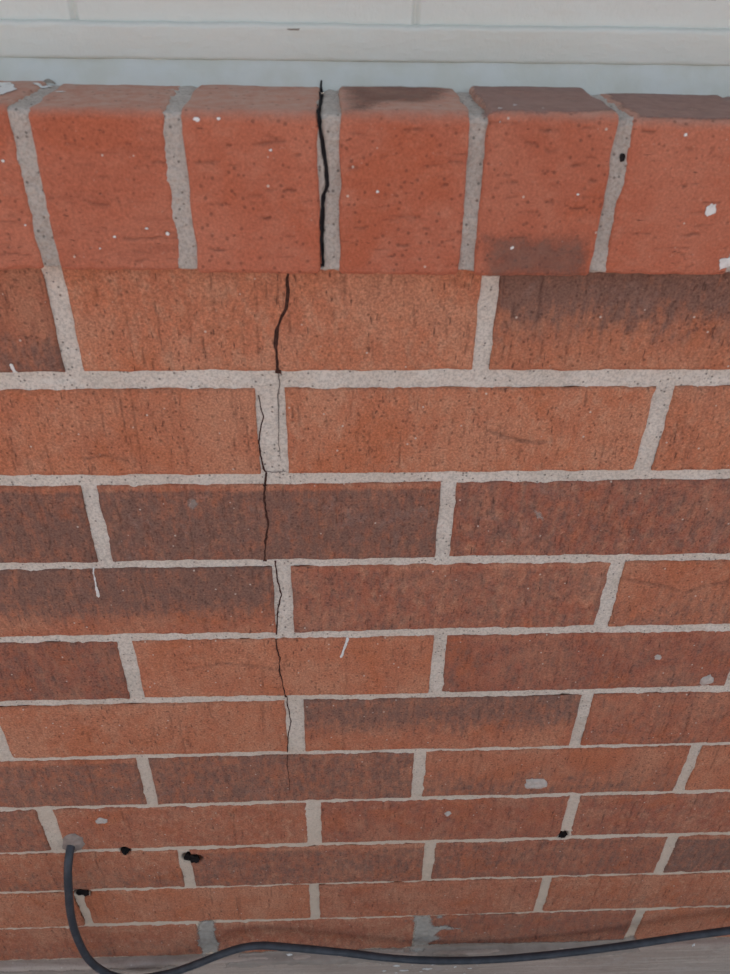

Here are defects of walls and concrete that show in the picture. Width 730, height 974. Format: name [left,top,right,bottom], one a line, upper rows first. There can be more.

crack [316,80,329,267]
crack [258,273,292,791]